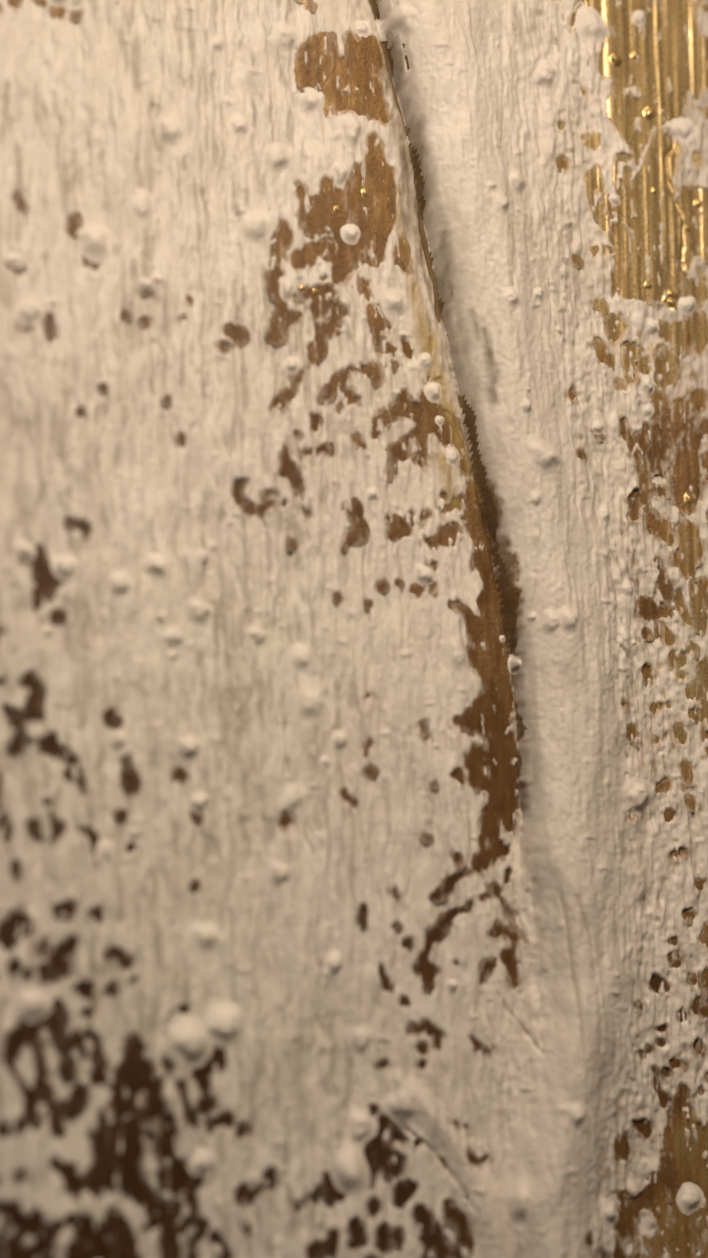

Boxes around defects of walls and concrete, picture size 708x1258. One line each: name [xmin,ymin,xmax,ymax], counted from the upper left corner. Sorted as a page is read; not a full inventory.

peeling [2,672,85,796]
peeling [114,756,142,822]
peeling [232,31,413,518]
peeling [341,497,370,554]
crack [369,0,453,323]
peeling [351,376,523,996]
crack [447,356,528,809]
peeling [569,0,708,756]
peeling [0,902,252,1258]
peeling [306,1104,474,1258]
peeling [378,963,443,1069]
peeling [586,938,708,1258]